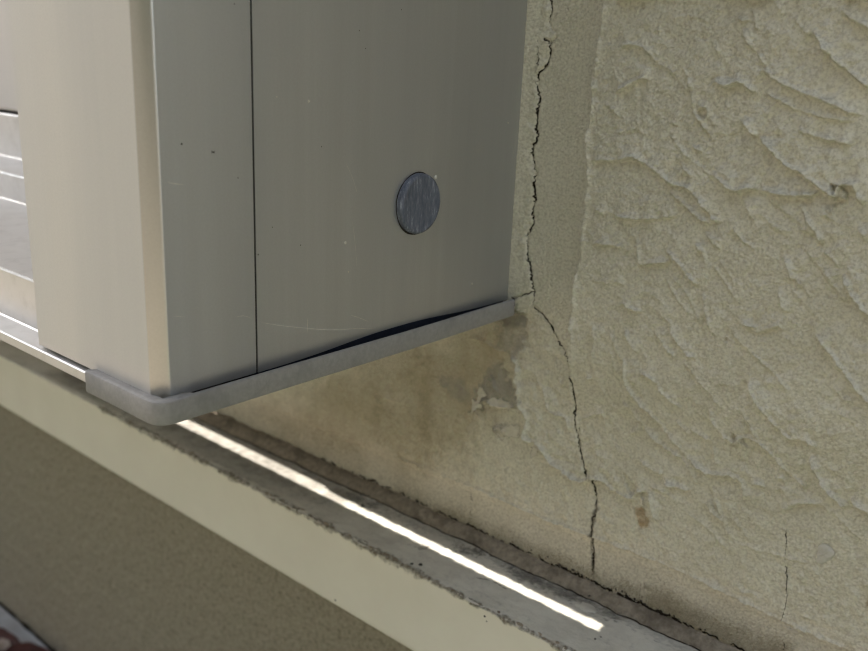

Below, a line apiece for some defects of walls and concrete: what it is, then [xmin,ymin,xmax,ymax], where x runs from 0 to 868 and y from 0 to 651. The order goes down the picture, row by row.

crack [194,0,745,651]